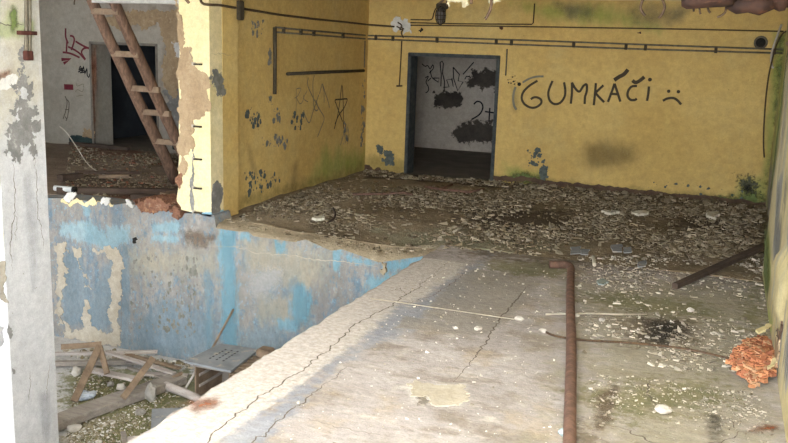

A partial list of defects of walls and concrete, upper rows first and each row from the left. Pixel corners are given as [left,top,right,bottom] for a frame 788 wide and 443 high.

spalling [125,0,226,220]
spalling [244,169,280,198]
leakage [736,173,761,195]
spalling [216,219,436,275]
spalling [0,261,9,303]
peeling [54,241,125,347]
spalling [0,323,13,347]
crack [207,263,464,443]
crack [453,286,528,382]